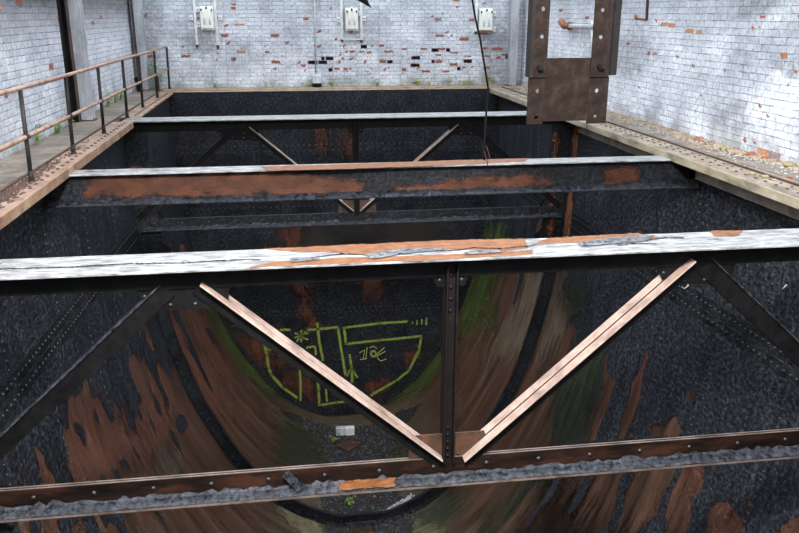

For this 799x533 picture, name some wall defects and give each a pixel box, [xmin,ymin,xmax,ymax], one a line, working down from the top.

peeling [0,198,141,259]
peeling [79,137,127,170]
rust [83,128,528,199]
rust [250,192,660,268]
rust [396,174,556,197]
peeling [571,125,636,158]
rust [604,166,638,185]
peeling [562,181,799,246]
peeling [559,268,656,351]
peeling [733,261,799,340]
rust [236,331,318,403]
peeling [688,458,799,533]